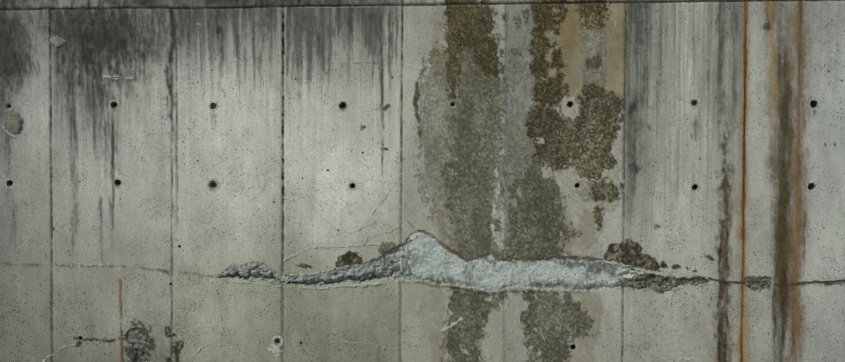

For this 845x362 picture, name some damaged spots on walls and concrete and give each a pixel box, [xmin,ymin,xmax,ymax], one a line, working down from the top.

damp [0,13,31,101]
damp [169,8,276,68]
damp [286,1,383,105]
damp [413,0,515,262]
spalling [216,0,711,362]
corrosion [737,0,748,362]
spalling [122,319,155,362]
peeling [163,326,183,362]
damp [433,285,507,362]
crack [708,276,744,284]
corrosion [792,141,802,361]
crack [773,279,845,287]